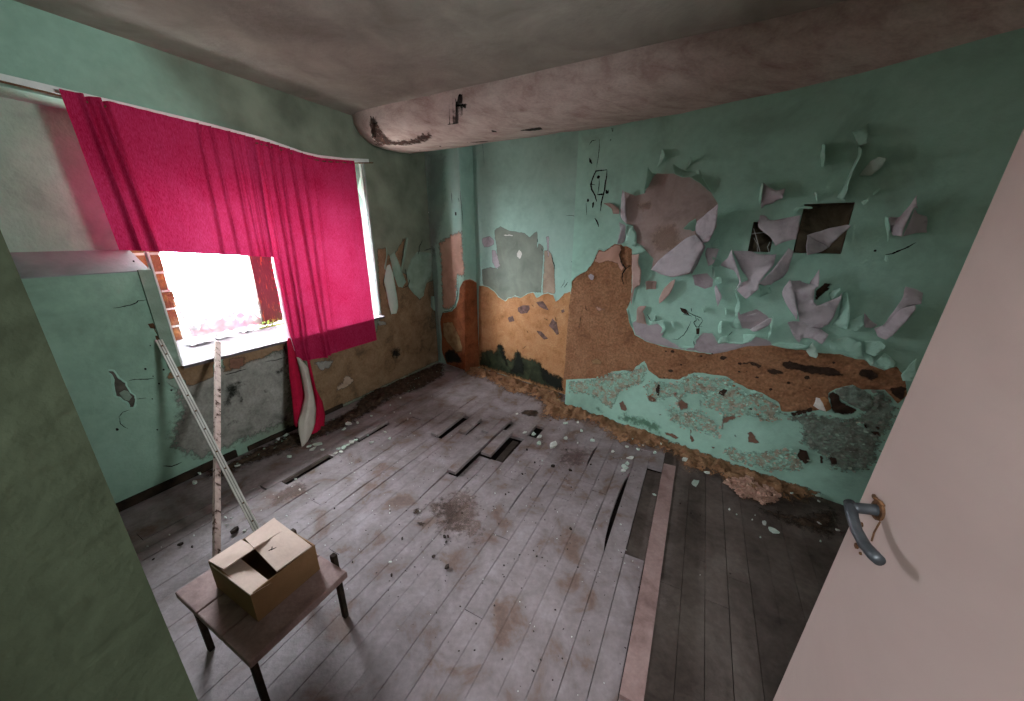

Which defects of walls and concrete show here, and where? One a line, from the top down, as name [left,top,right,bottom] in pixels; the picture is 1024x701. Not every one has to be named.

hole [793,202,855,254]
spalling [310,222,907,473]
spalling [108,369,137,409]
mould [226,382,243,404]